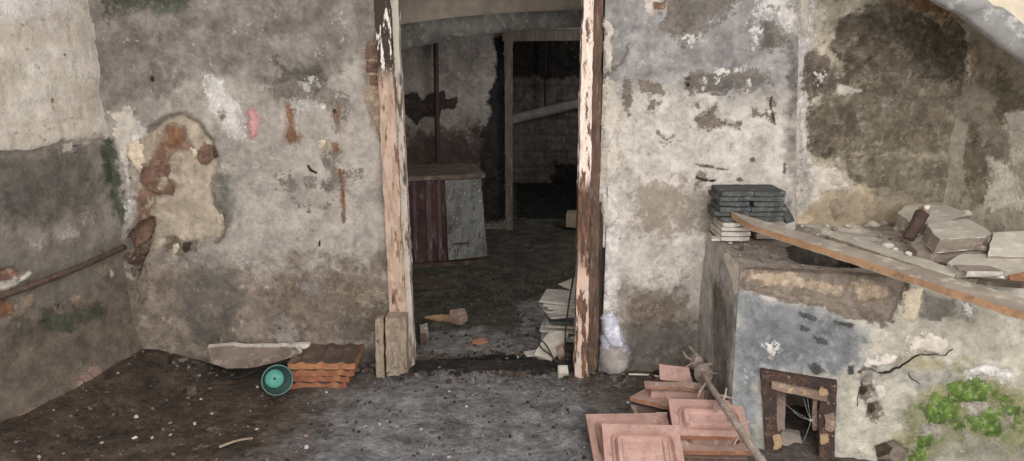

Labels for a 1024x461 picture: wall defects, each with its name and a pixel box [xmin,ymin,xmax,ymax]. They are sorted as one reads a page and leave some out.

rust [284,103,299,144]
flaking render [404,91,458,125]
peeling [684,66,777,132]
leakage [788,0,968,227]
spalling [59,105,229,304]
rust [337,169,346,223]
spalling [724,252,974,329]
crack [857,349,953,406]